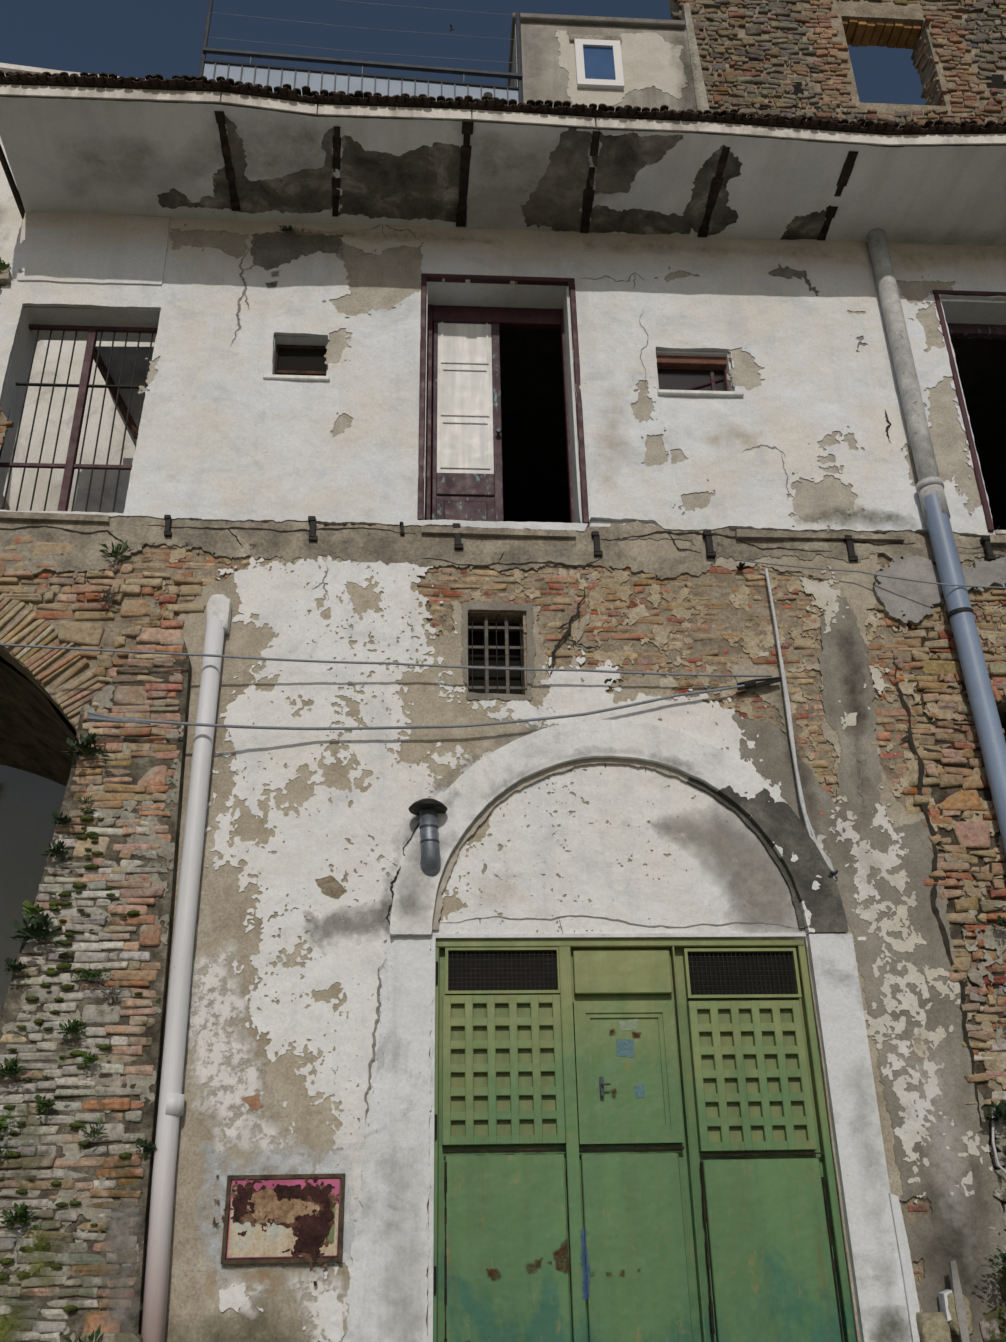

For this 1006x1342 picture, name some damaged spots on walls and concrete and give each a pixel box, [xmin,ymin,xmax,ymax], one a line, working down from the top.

peeling [555,30,688,110]
flaking render [157,116,461,365]
crack [230,248,264,347]
peeling [315,568,384,628]
crack [0,525,916,674]
peeling [227,685,379,854]
peeling [384,660,538,798]
spalling [315,876,347,899]
flaking render [417,561,993,1227]
water stain [665,817,792,927]
rust [212,1176,339,1287]
rust [528,1240,570,1273]